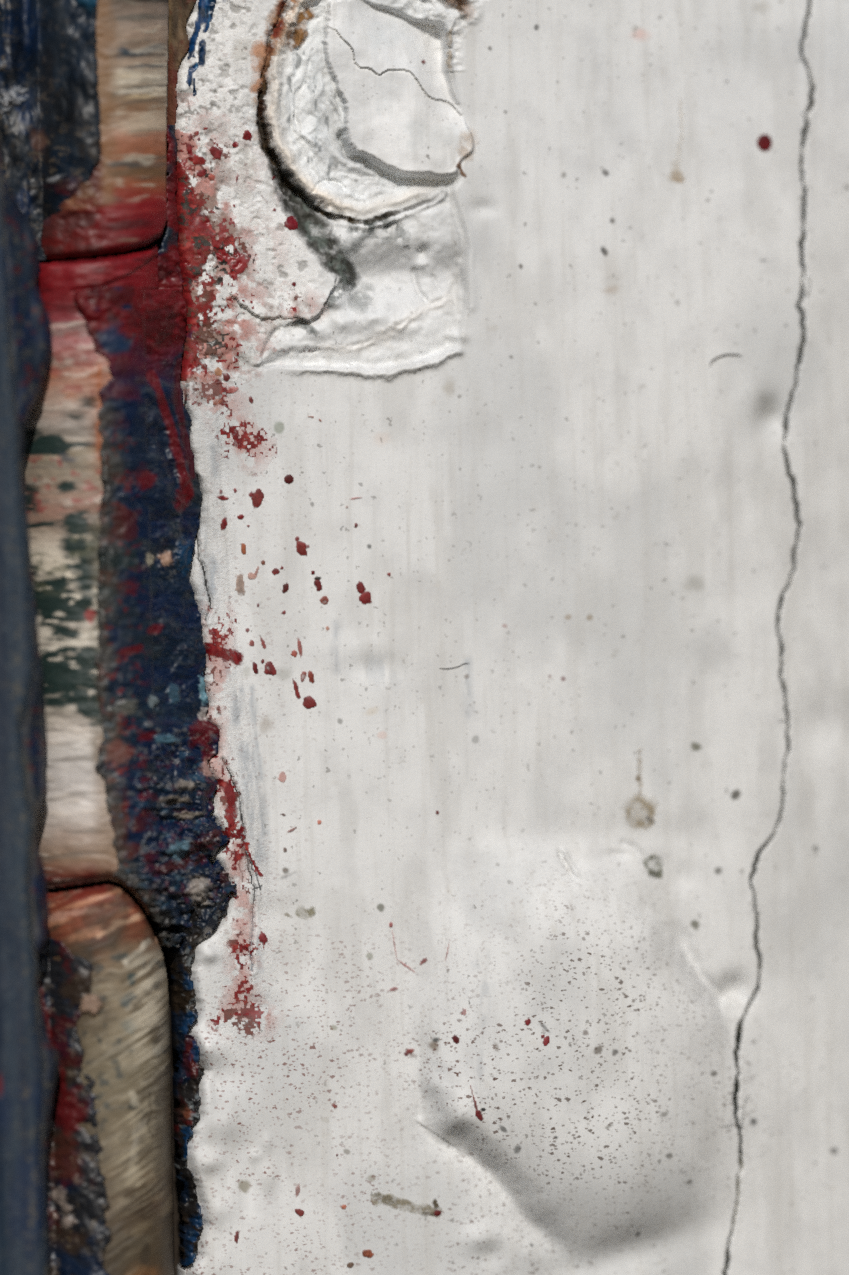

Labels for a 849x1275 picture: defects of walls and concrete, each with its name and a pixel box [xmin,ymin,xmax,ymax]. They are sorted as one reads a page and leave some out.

rust [253,0,314,193]
crack [722,0,815,1275]
peeling [144,900,228,1267]